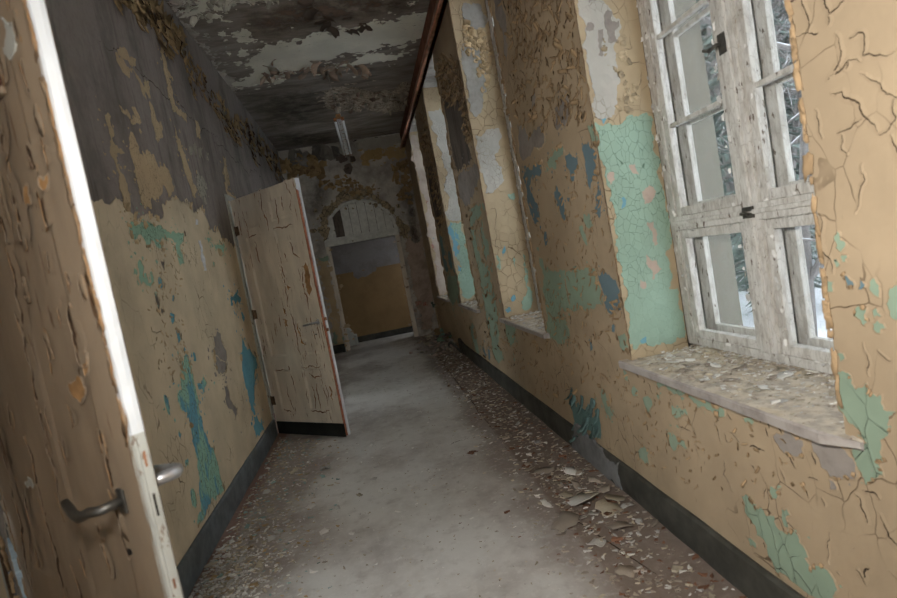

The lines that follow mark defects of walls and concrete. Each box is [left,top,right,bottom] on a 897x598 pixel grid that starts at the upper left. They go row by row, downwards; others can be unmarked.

crack [0,16,22,85]
peeling [12,0,39,64]
crack [790,0,897,214]
spalling [390,0,661,366]
peeling [0,75,128,447]
spalling [45,0,376,542]
peeling [740,0,897,598]
peeling [564,369,726,489]
crack [677,419,828,507]
crack [825,532,872,587]
crack [853,485,897,550]